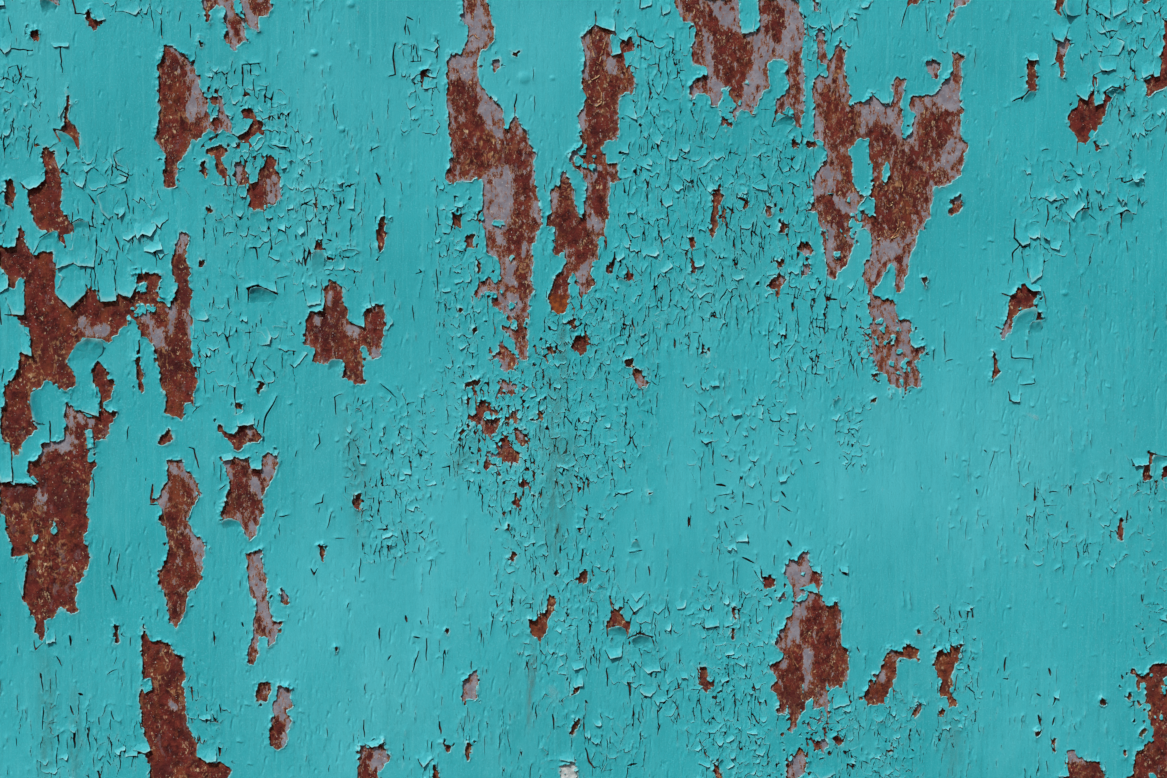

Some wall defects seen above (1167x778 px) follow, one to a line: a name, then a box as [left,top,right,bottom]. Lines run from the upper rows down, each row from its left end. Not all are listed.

peeling [30,30,69,47]
peeling [40,0,60,15]
peeling [202,0,273,51]
crack [1002,149,1130,294]
crack [225,146,385,426]
crack [768,256,852,352]
peeling [345,0,982,778]
crack [1008,341,1042,402]
crack [712,450,753,527]
crack [984,450,1096,550]
crack [543,493,710,777]
crack [966,657,1056,725]